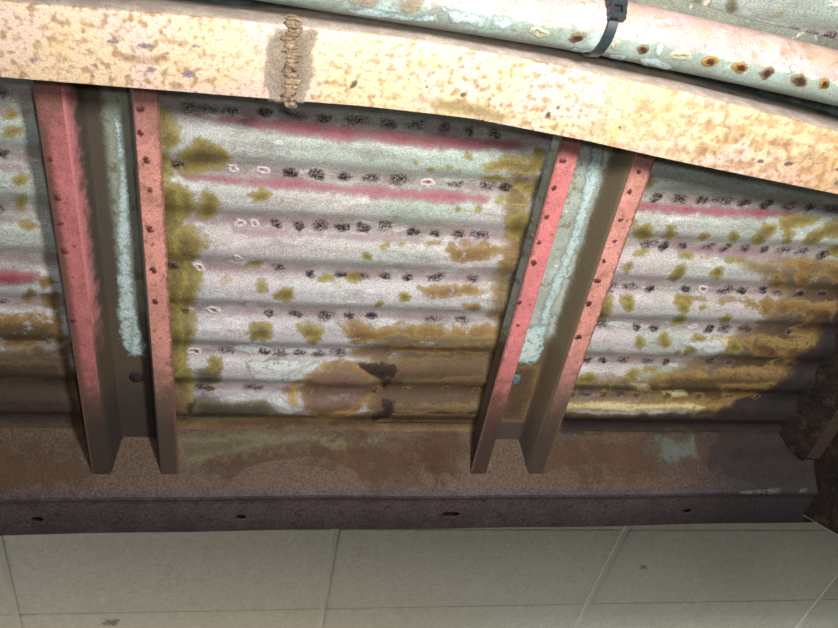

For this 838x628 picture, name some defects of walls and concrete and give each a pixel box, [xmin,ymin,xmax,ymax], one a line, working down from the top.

corrosion [732,62,748,74]
corrosion [759,67,774,80]
corrosion [791,74,807,87]